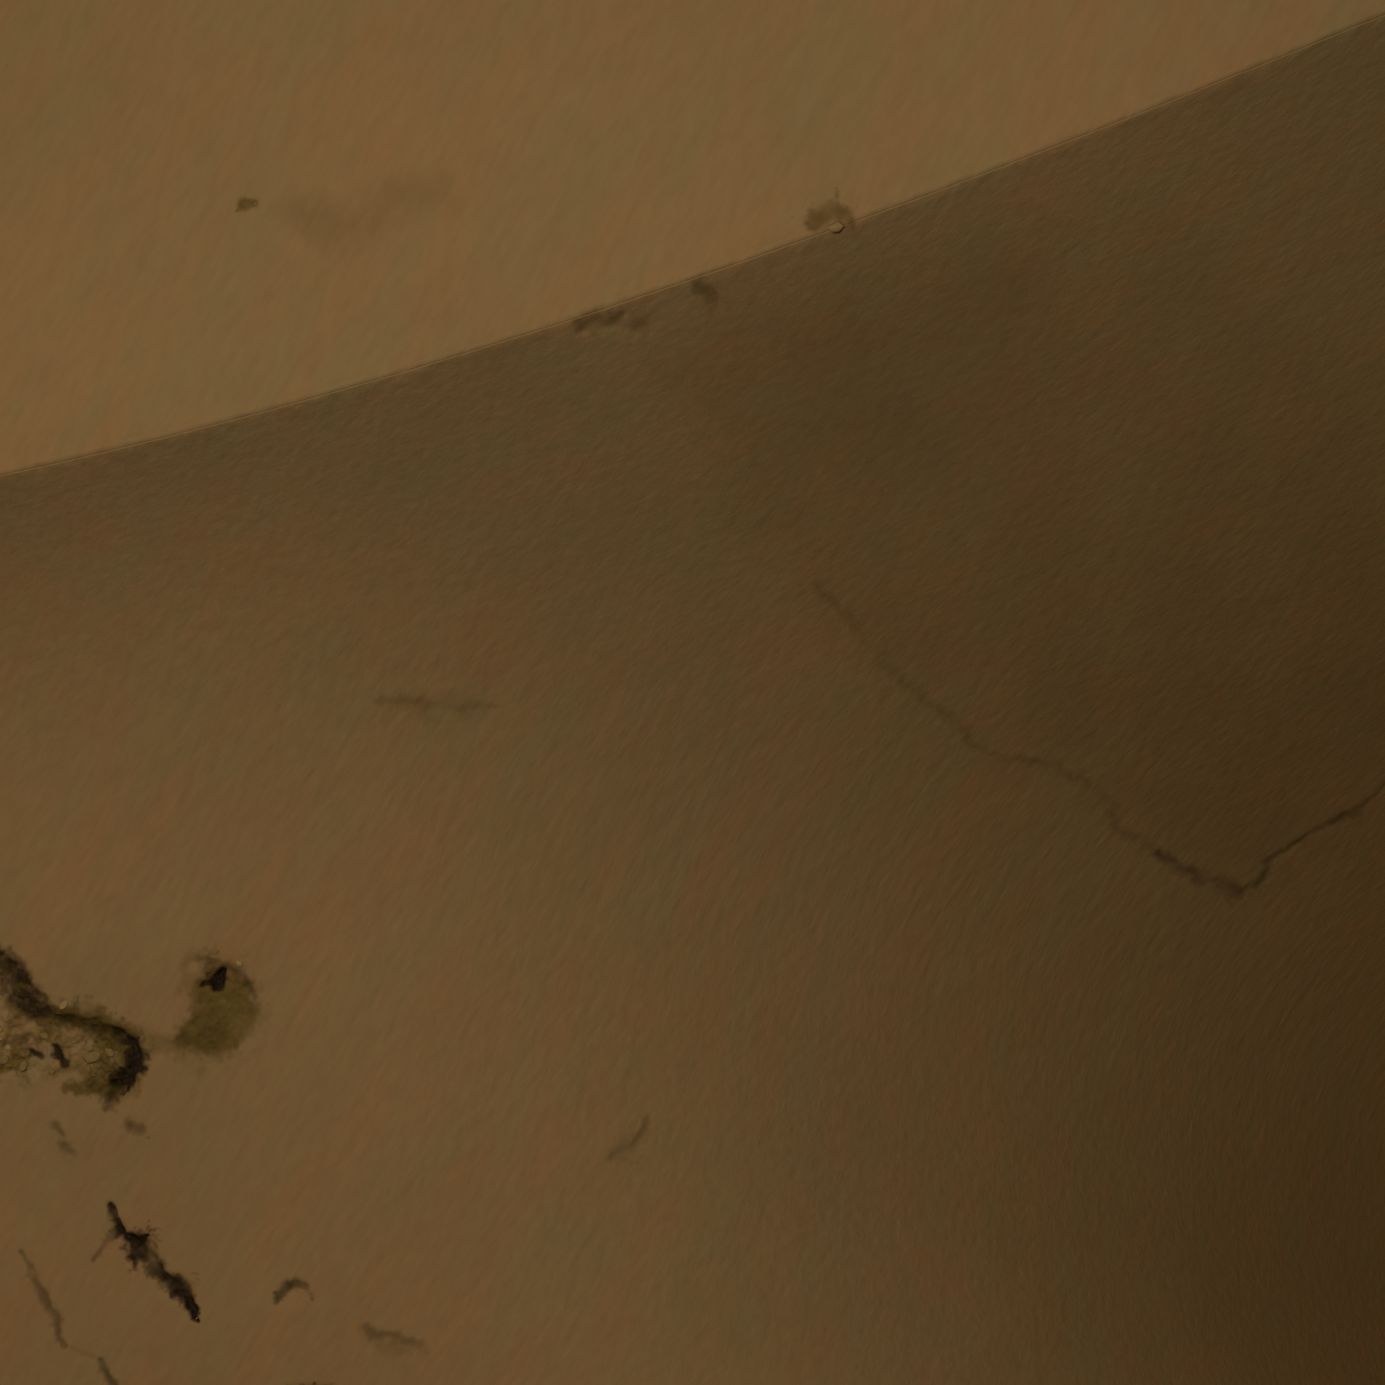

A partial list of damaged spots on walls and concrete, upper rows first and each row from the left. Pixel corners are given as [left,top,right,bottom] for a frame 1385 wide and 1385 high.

flaking render [0,952,148,1100]
flaking render [183,949,252,1048]
crack [108,1202,200,1322]